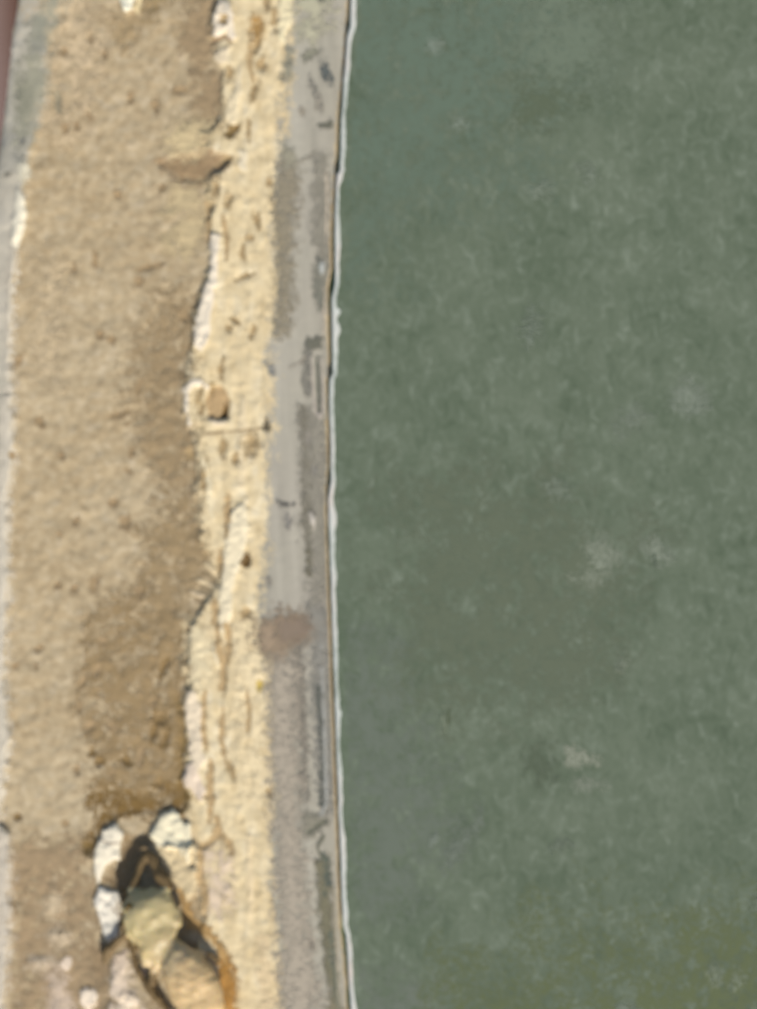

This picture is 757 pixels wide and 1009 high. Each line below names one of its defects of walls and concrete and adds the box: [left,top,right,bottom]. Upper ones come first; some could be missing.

peeling [120,0,142,14]
peeling [208,0,293,212]
peeling [194,234,220,351]
spalling [224,316,258,341]
spalling [232,209,262,283]
peeling [184,442,215,520]
peeling [182,356,228,426]
spalling [217,417,272,466]
peeling [0,156,82,1009]
peeling [155,498,282,828]
peeling [80,824,123,942]
peeling [149,809,239,924]